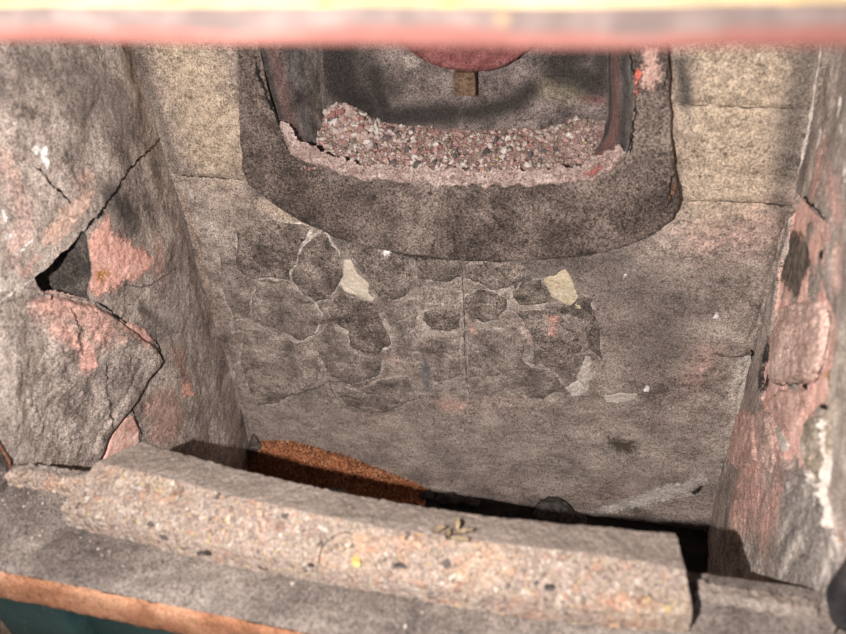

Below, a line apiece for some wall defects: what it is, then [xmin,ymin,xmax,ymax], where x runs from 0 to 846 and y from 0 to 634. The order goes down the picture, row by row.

crack [35,166,71,205]
crack [81,138,160,233]
spalling [34,214,165,301]
spalling [120,320,154,342]
efflorescence [805,419,834,529]